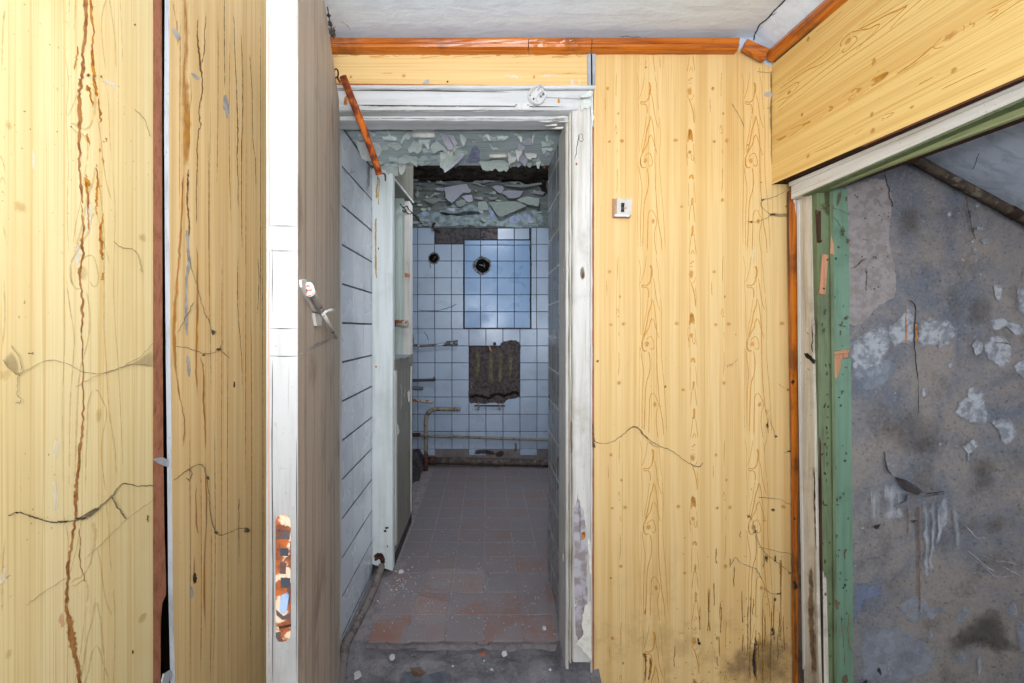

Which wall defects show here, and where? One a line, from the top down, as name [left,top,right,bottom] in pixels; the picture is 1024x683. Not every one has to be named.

crack [753,0,785,41]
peeling [356,116,569,268]
corrosion [65,0,107,683]
crack [190,50,263,636]
crack [909,300,919,413]
peeling [562,495,592,662]
leakage [873,487,901,520]
spalling [884,452,945,509]
leakage [924,502,986,570]